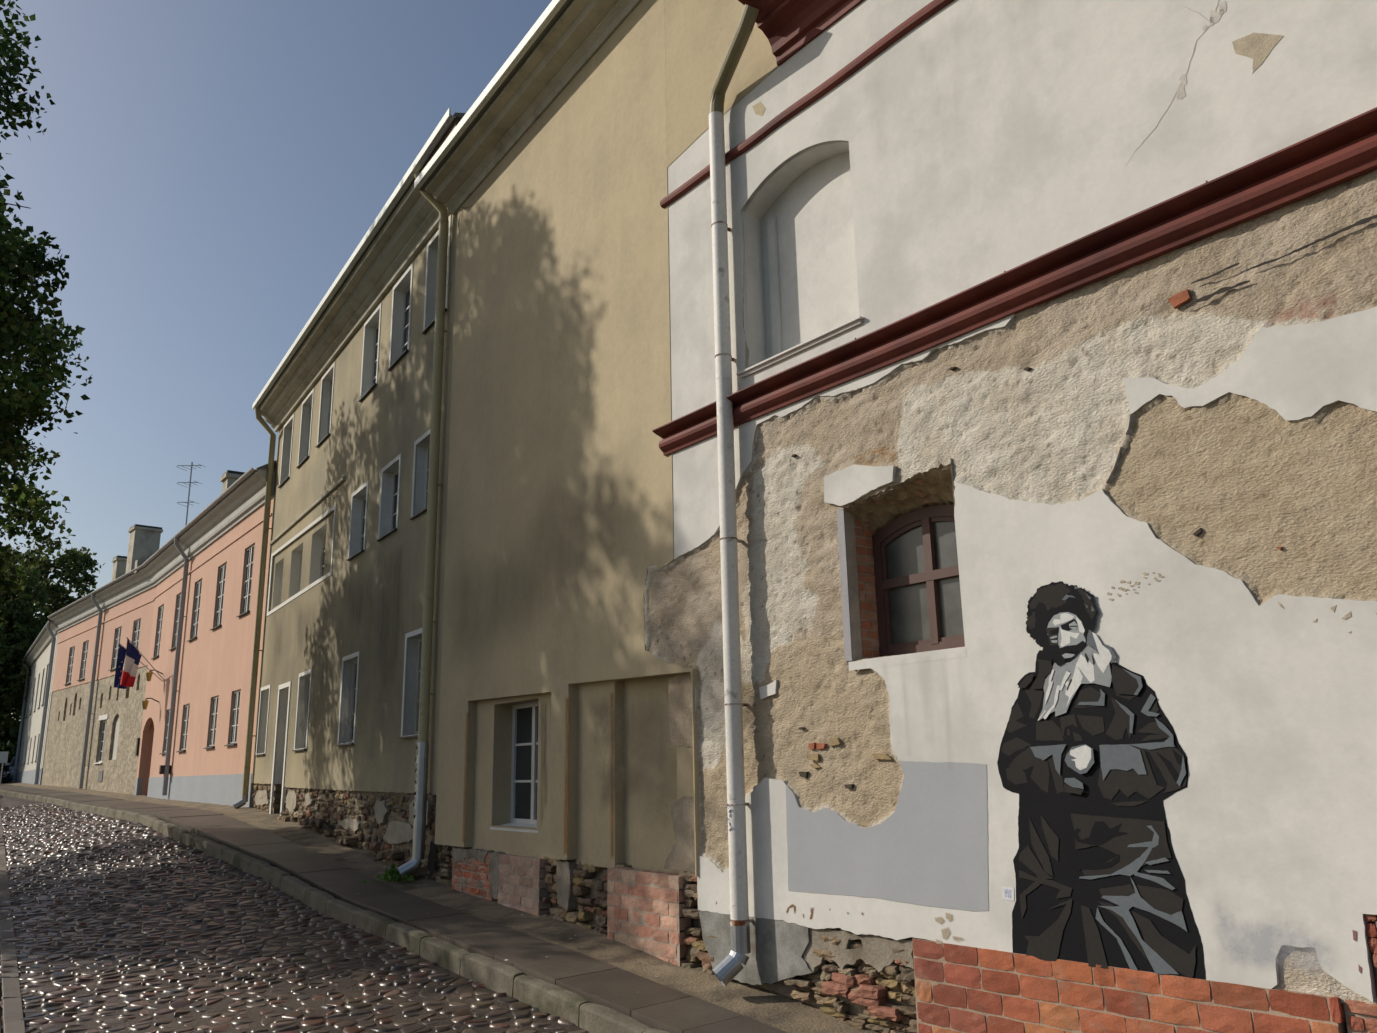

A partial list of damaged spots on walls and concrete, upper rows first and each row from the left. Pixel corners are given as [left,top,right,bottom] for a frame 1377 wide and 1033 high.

crack [1126,0,1227,165]
peeling [1232,33,1283,73]
spalling [644,169,1377,872]